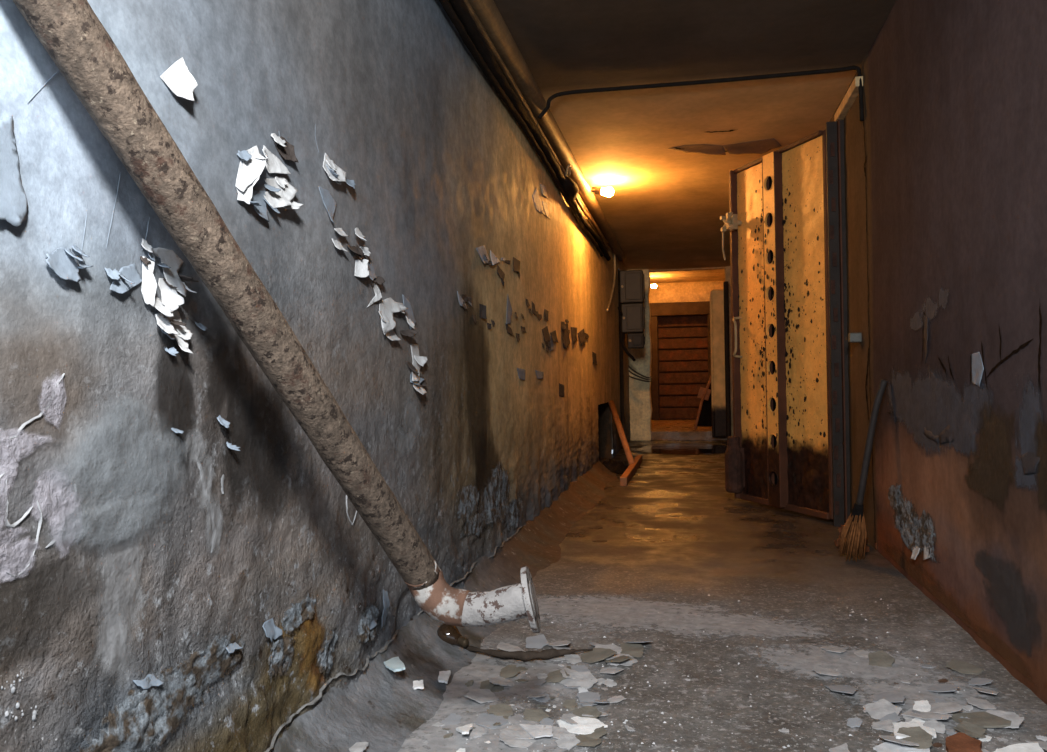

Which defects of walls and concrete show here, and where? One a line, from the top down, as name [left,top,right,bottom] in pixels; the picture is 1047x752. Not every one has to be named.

peeling [160,57,198,101]
peeling [0,115,29,227]
peeling [235,133,304,222]
peeling [45,238,208,356]
peeling [318,153,427,394]
peeling [457,245,597,365]
flaking render [887,287,992,456]
flaking render [1014,378,1043,490]
peeling [911,545,931,560]
spalling [81,632,245,752]
spalling [262,592,317,679]
spalling [316,630,339,677]